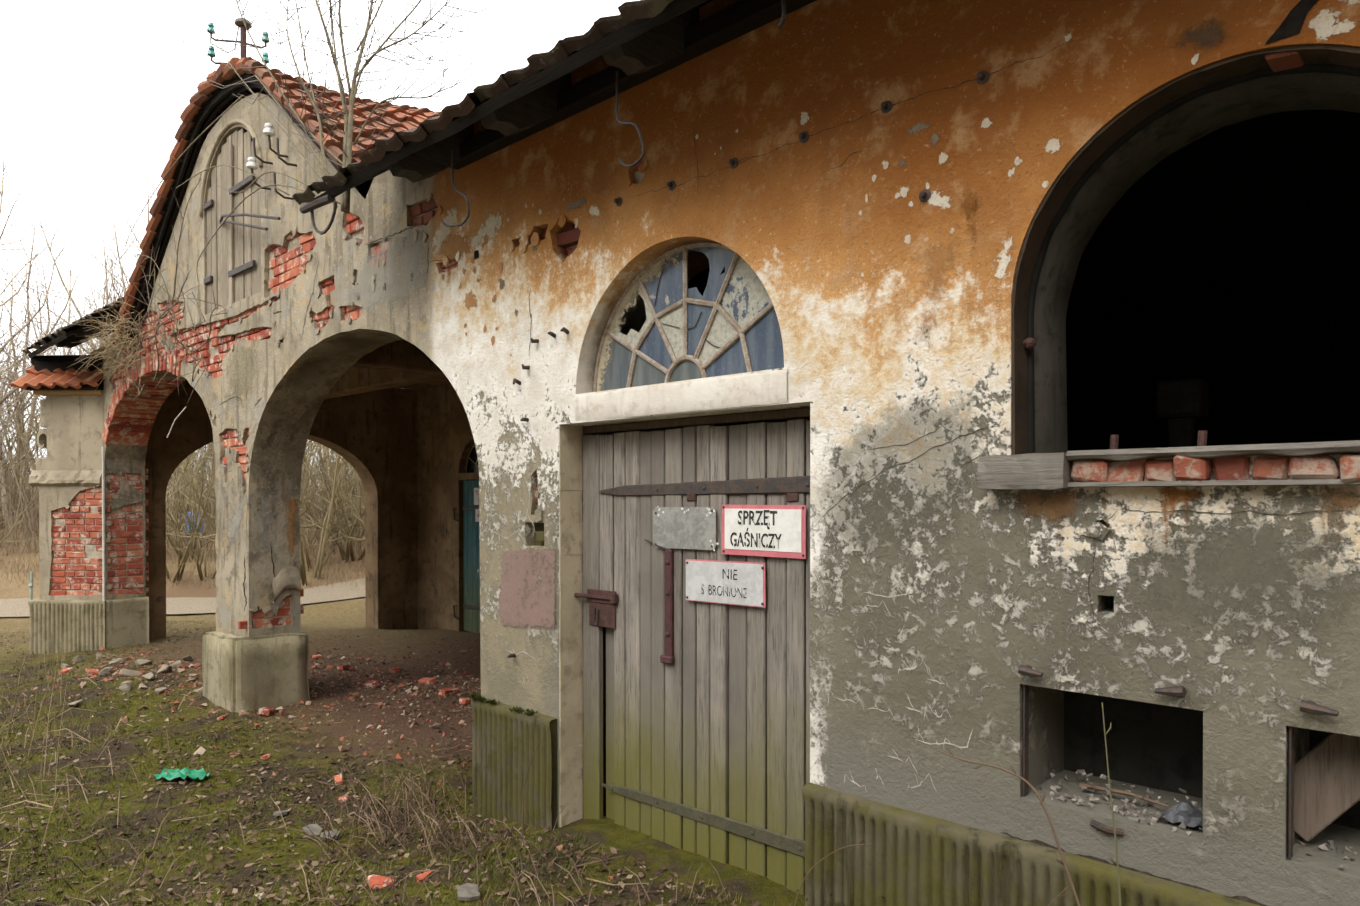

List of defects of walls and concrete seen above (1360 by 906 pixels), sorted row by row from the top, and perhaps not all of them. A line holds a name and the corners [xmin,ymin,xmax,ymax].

flaking render [1078,520,1110,540]